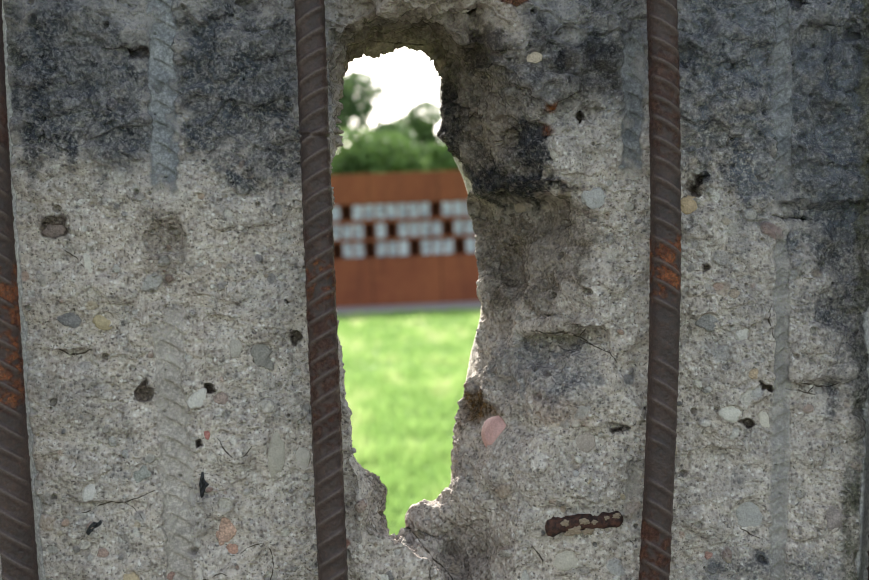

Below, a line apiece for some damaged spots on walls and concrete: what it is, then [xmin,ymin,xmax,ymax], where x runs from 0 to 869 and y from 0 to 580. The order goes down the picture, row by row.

water stain [8,0,152,174]
water stain [176,0,300,191]
water stain [679,0,777,204]
water stain [787,0,869,334]
corrosion [0,264,25,406]
corrosion [649,236,681,296]
corrosion [639,520,672,580]